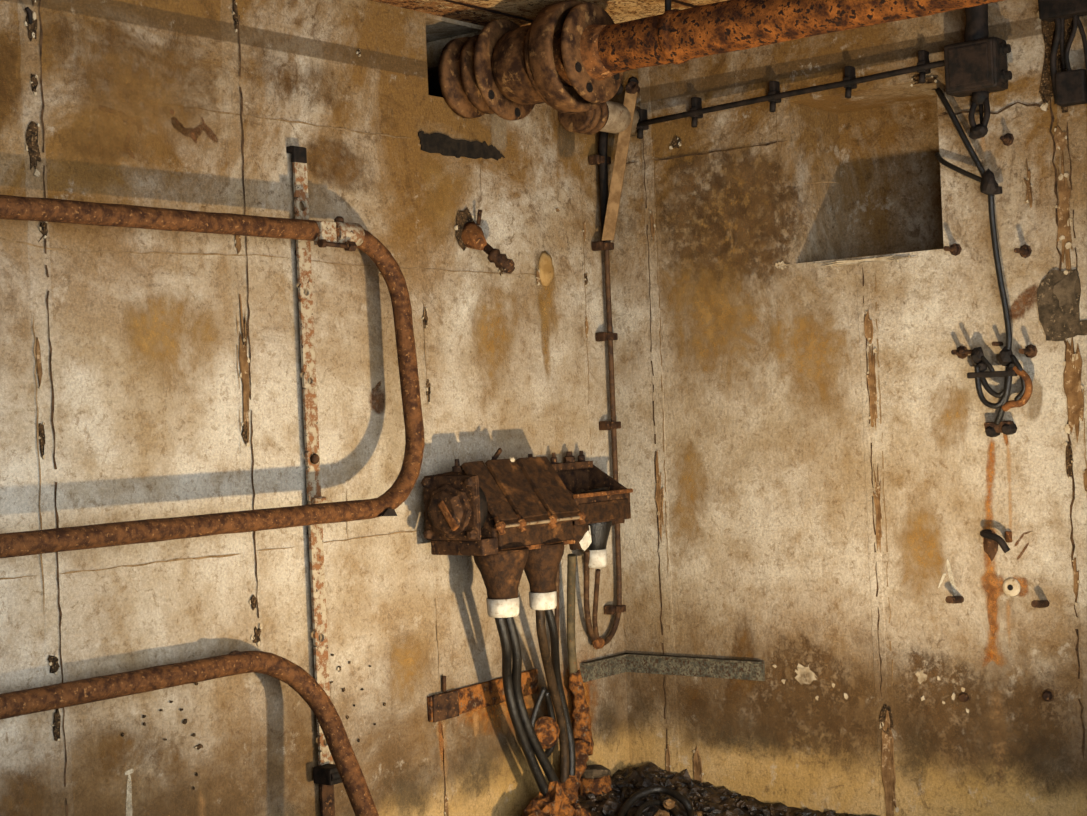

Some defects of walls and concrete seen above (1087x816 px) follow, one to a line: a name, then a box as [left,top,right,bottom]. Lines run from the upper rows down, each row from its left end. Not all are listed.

spalling [24,0,37,41]
spalling [29,74,38,96]
spalling [25,121,41,177]
spalling [239,294,250,447]
rust [984,434,1010,530]
rust [981,553,1028,664]
water stain [683,635,867,761]
water stain [898,649,1068,790]